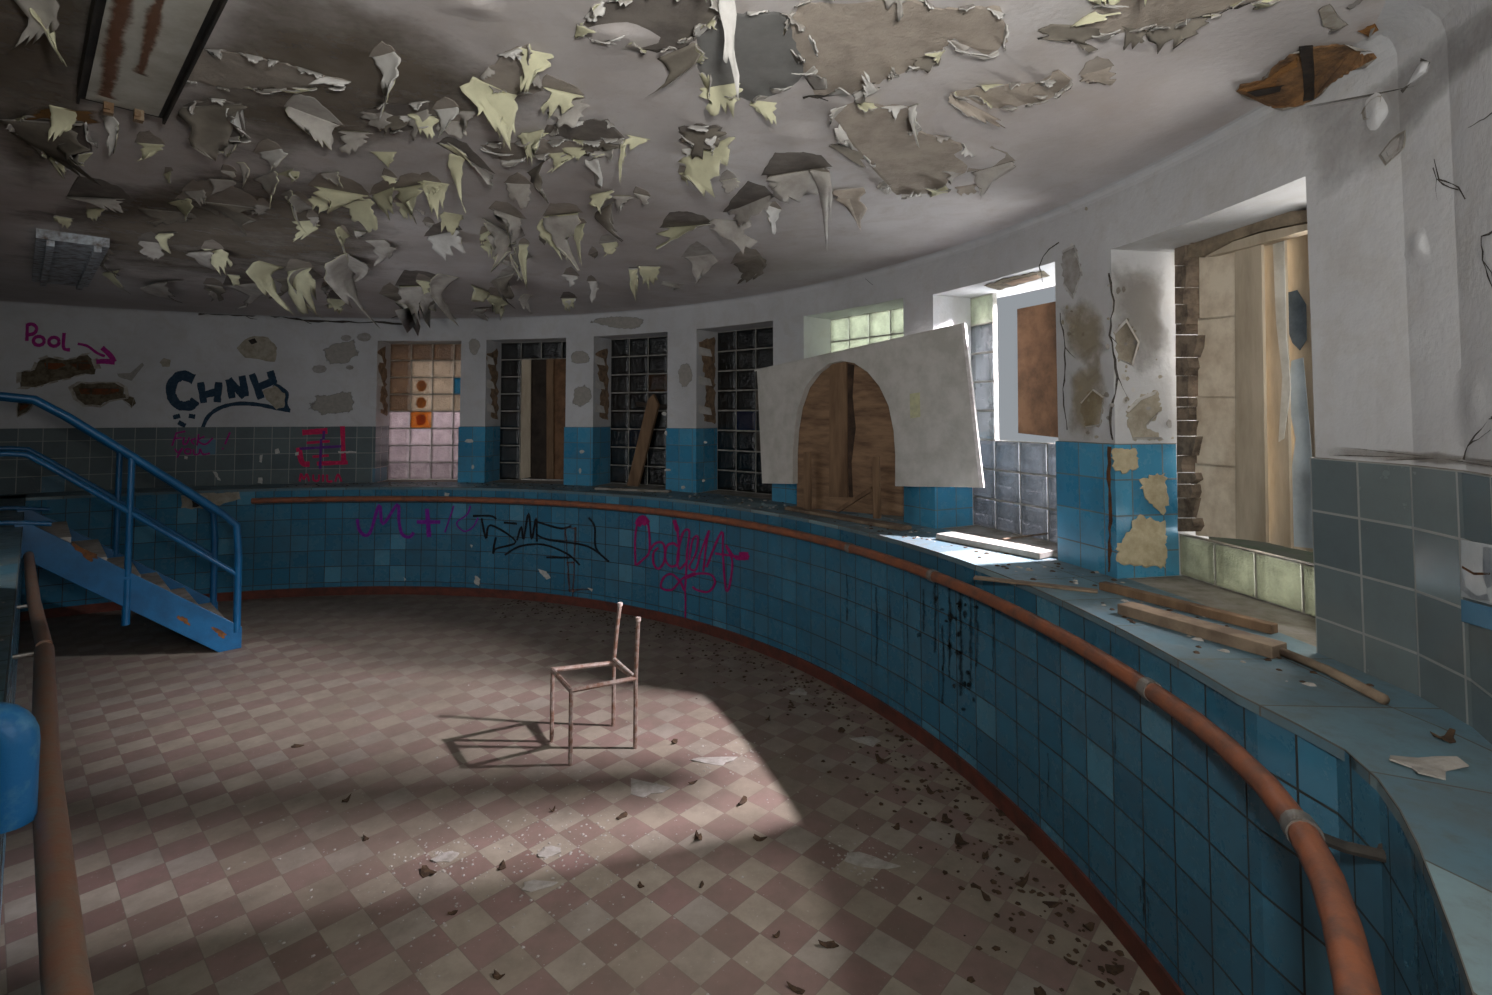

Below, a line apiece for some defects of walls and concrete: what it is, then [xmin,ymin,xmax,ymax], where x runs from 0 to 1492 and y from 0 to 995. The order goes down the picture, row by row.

corrosion [25,0,164,124]
peeling [948,0,1281,128]
peeling [1319,0,1378,70]
peeling [0,0,1016,424]
peeling [984,225,1083,336]
flaking render [1378,130,1406,166]
crack [1433,159,1466,199]
crack [1481,231,1492,287]
spalling [1078,243,1205,569]
crack [1463,416,1492,460]
leakage [875,583,994,711]